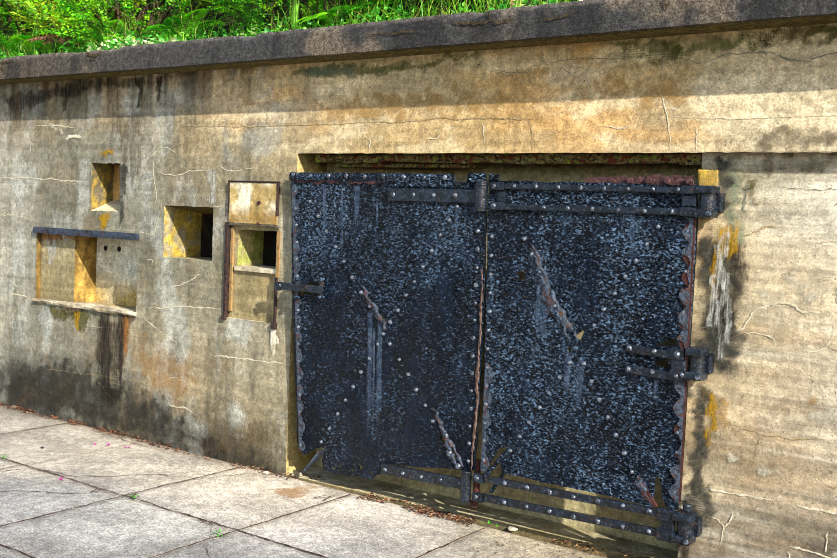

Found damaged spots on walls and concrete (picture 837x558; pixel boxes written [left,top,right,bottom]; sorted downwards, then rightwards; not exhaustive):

water stain [6,77,170,224]
crack [476,57,630,103]
crack [659,52,837,150]
water stain [758,125,791,149]
crack [728,176,780,236]
water stain [697,156,748,371]
crack [738,298,837,354]
water stain [7,306,205,447]